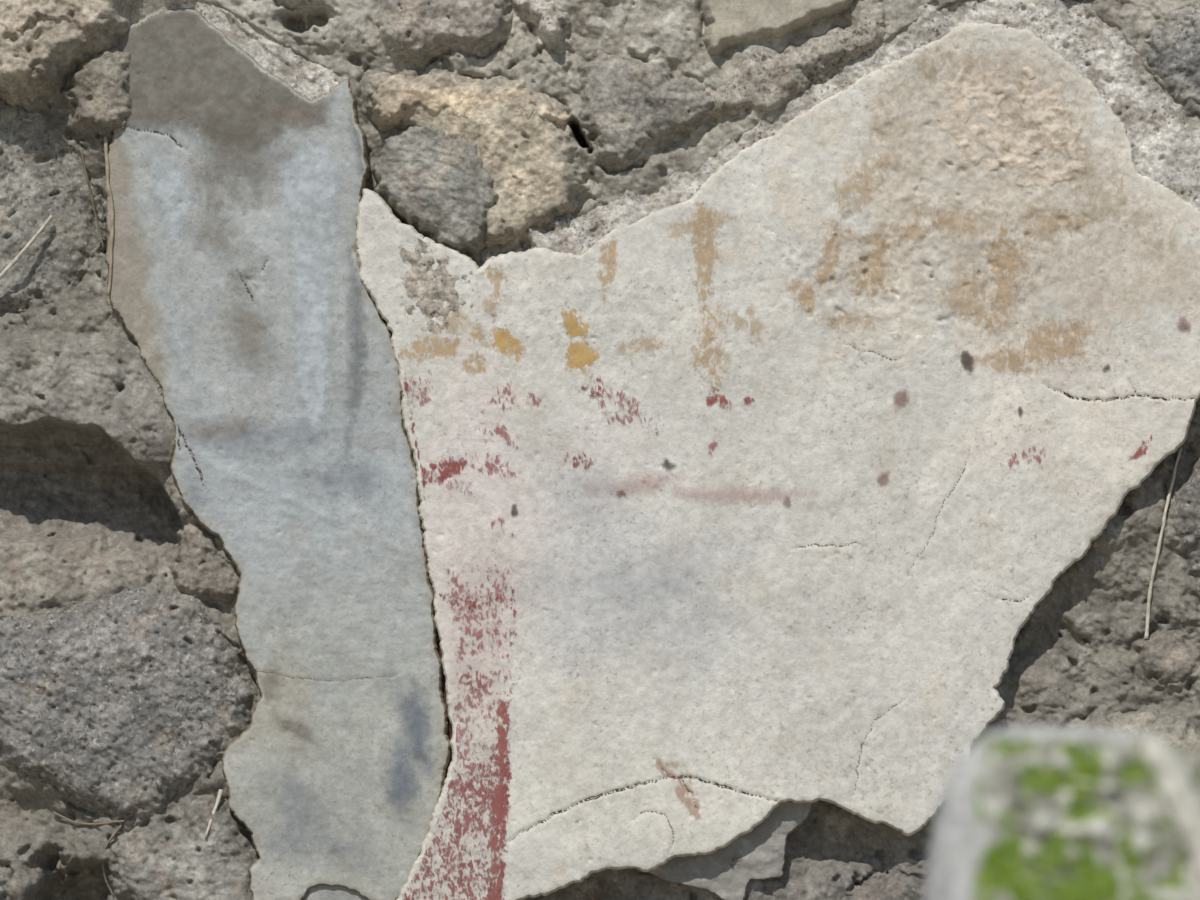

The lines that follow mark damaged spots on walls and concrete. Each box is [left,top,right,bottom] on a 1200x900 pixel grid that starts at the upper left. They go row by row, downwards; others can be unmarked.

crack [1044,384,1193,402]
peeling [1000,446,1046,480]
crack [908,449,970,575]
crack [512,762,775,848]